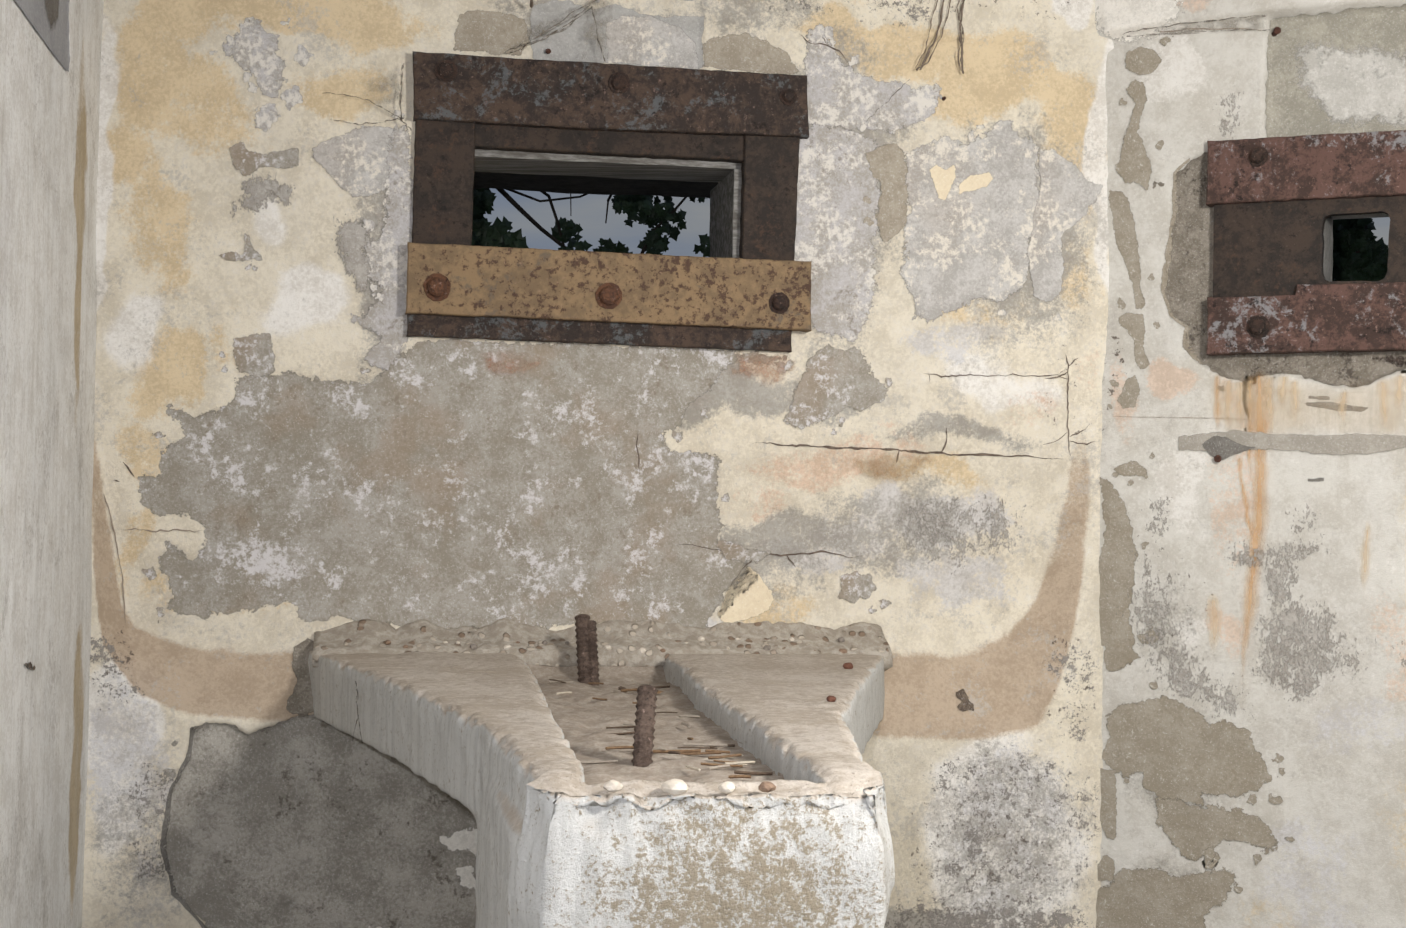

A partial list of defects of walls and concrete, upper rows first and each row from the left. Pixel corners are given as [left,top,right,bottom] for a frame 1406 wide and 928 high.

peeling [138,0,1406,702]
crack [755,356,1251,463]
water stain [90,636,144,701]
spalling [631,685,658,767]
peeling [956,689,974,711]
water stain [1042,645,1095,741]
peeling [1096,452,1295,928]
spalling [160,638,477,928]